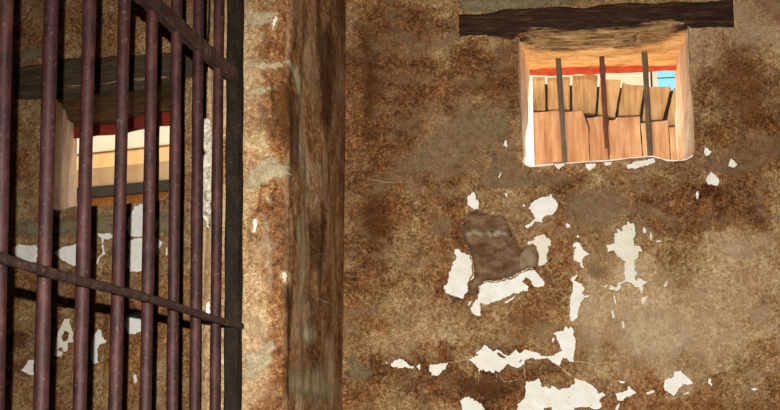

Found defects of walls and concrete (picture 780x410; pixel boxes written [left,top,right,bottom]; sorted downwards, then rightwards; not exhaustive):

peeling [10,243,38,264]
peeling [54,242,76,268]
peeling [90,232,113,266]
peeling [126,203,143,274]
flaking render [442,190,560,318]
peeling [604,220,661,328]
peeling [467,235,591,376]
peeling [53,317,74,359]
peeling [89,327,108,365]
peeling [20,358,34,376]
peeling [386,357,449,377]
peeling [516,369,695,410]